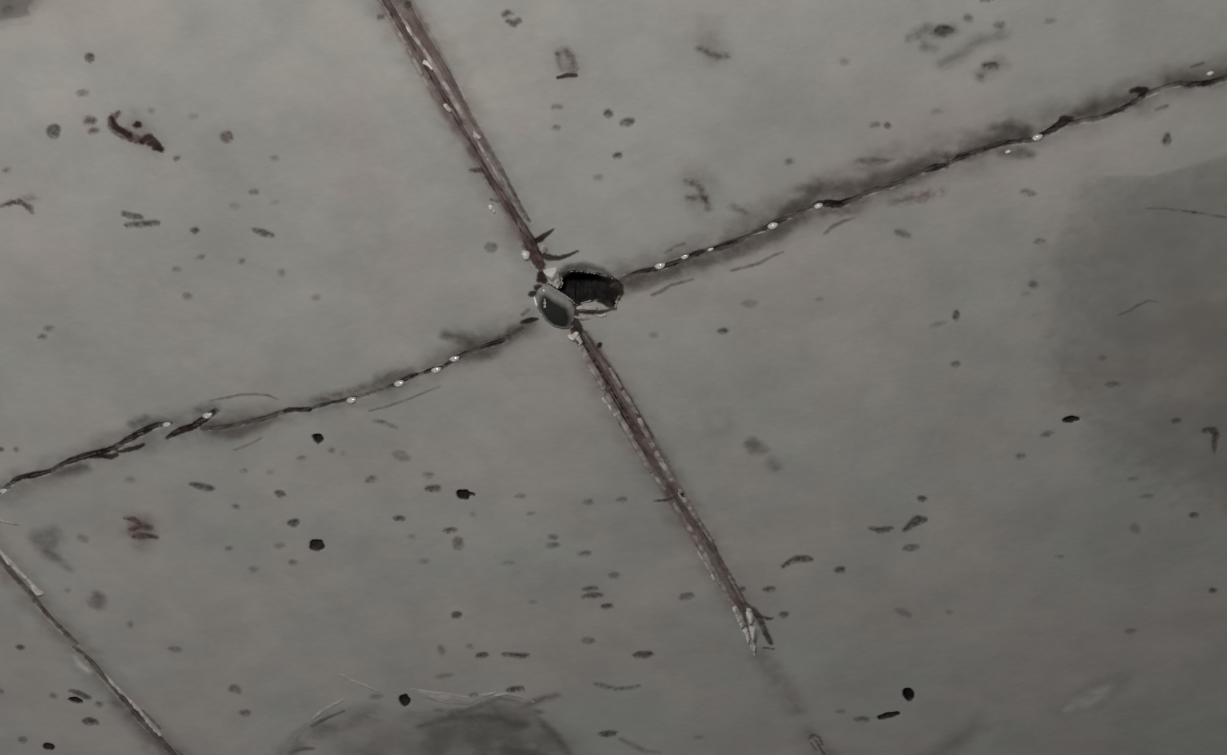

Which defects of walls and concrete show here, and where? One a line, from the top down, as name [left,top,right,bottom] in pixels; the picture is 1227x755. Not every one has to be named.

crack [378,0,578,271]
crack [611,73,1227,287]
crack [6,317,538,486]
hole [528,264,624,341]
crack [571,328,773,656]
crack [0,519,177,755]